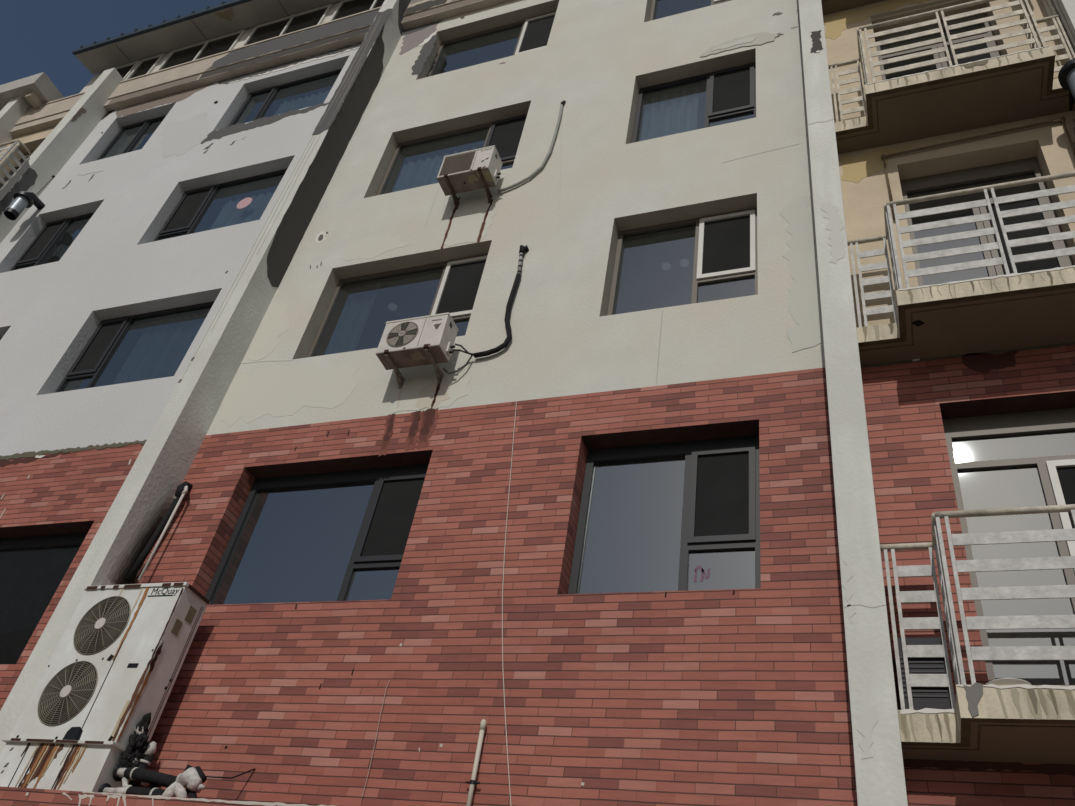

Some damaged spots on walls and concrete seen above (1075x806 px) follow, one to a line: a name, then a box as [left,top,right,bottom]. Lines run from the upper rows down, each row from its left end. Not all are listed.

spalling [101,0,480,287]
spalling [777,2,823,166]